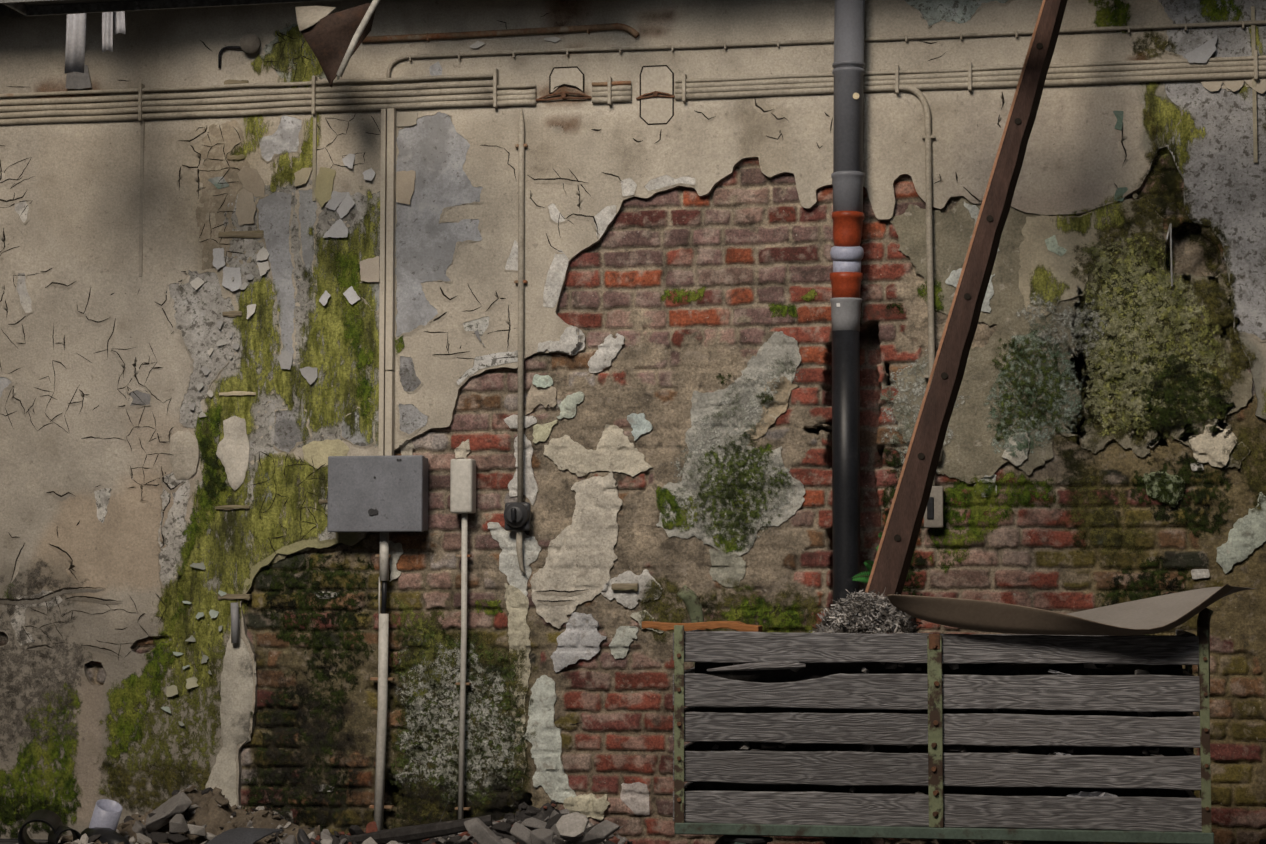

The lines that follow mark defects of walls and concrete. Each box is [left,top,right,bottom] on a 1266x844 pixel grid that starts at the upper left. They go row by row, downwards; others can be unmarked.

peeling [1157,0,1266,63]
crack [482,145,621,254]
crack [632,129,663,145]
crack [694,110,717,122]
peeling [1113,78,1266,352]
crack [0,125,243,659]
crack [425,285,515,359]
flaking render [860,175,964,592]
flaking render [971,322,997,348]
flaking render [156,108,834,844]
flaking render [887,367,1266,844]
water stain [242,684,375,829]